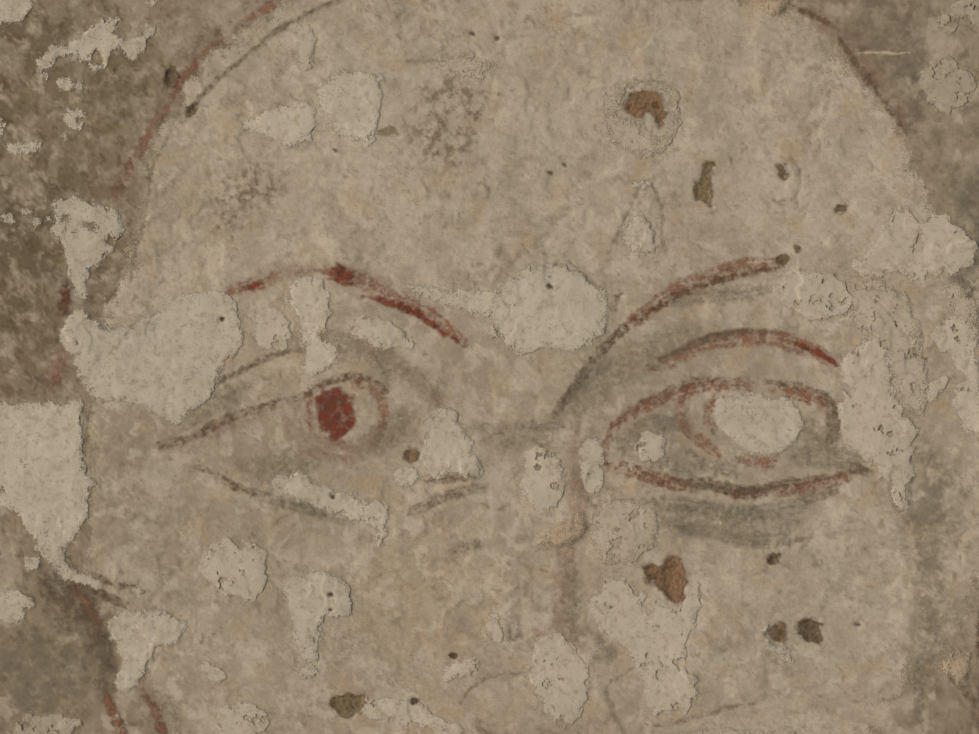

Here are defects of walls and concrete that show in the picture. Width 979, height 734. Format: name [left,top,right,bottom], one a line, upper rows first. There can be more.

peeling [35,15,156,95]
peeling [241,69,397,150]
peeling [601,77,683,160]
peeling [405,262,611,359]
peeling [0,194,340,591]
peeling [776,205,979,510]
peeling [392,405,485,488]
peeling [271,472,390,548]
peeling [198,537,268,603]
peeling [578,431,702,717]
peeling [102,608,188,694]
peeling [528,632,590,729]